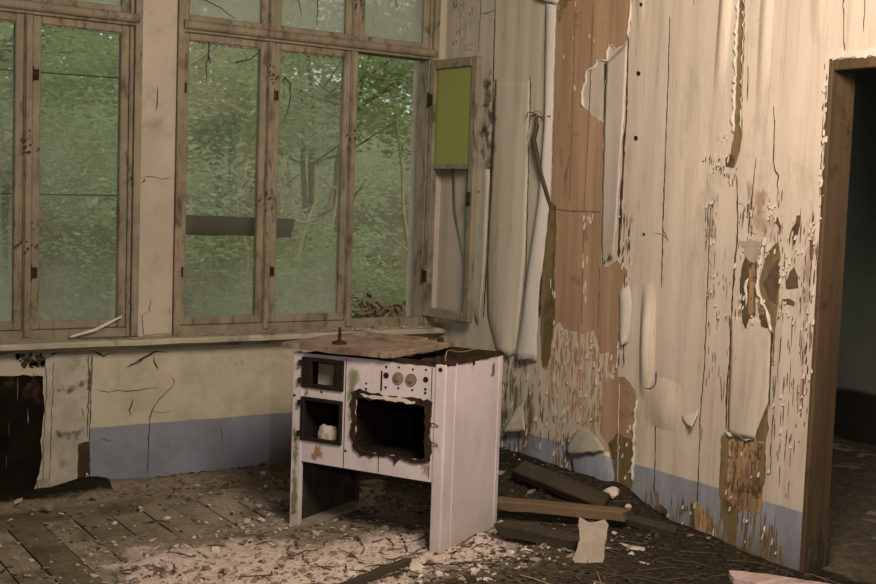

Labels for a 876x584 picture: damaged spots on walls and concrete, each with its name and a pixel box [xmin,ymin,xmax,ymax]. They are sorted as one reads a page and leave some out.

peeling [703,0,746,187]
peeling [451,0,638,491]
peeling [704,66,828,497]
flaking render [0,375,45,492]
flaking render [77,441,90,479]
crack [89,351,175,472]
peeling [645,486,732,541]
peeling [735,507,784,566]